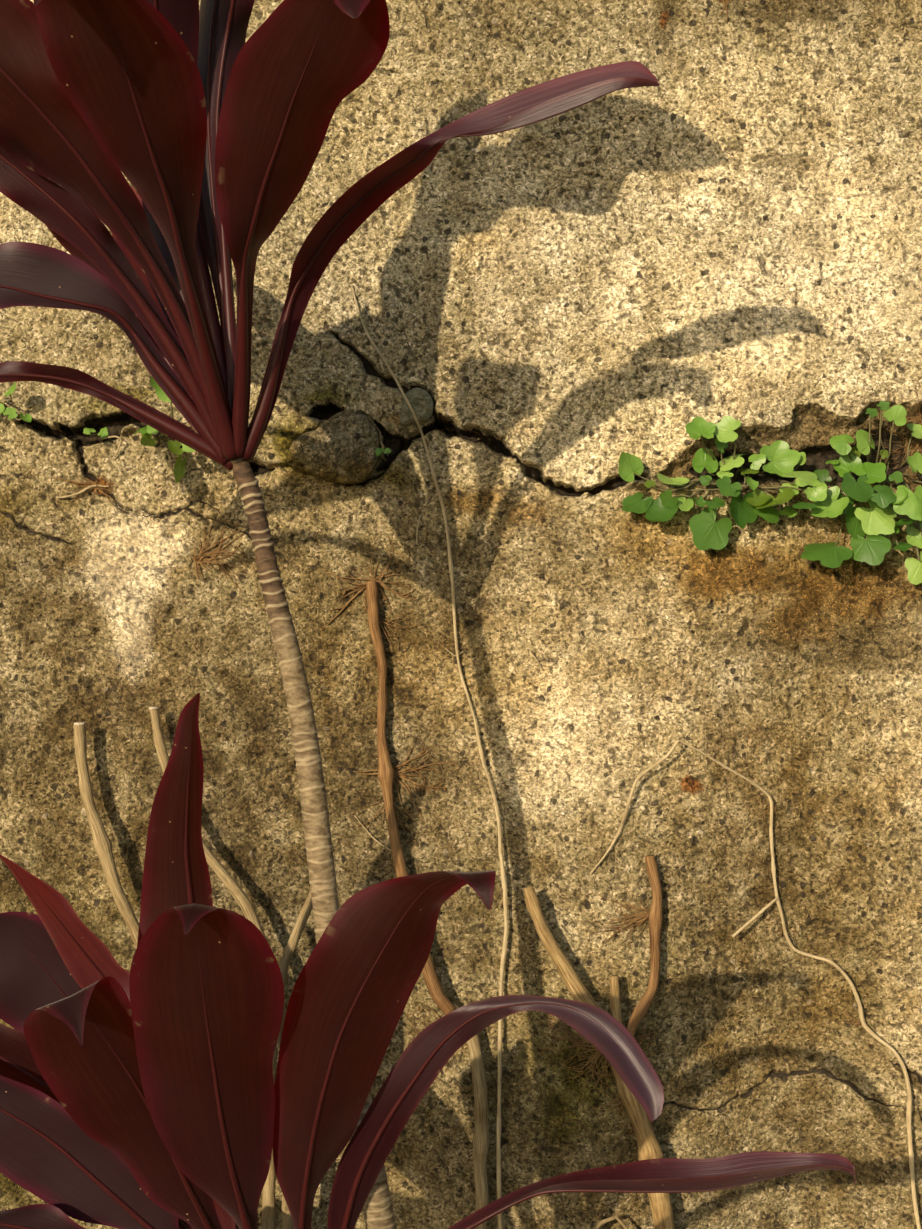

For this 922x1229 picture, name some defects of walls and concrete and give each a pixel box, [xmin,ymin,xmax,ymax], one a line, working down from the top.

crack [0,406,289,565]
crack [329,331,646,497]
water stain [688,545,913,672]
crack [663,1060,922,1122]